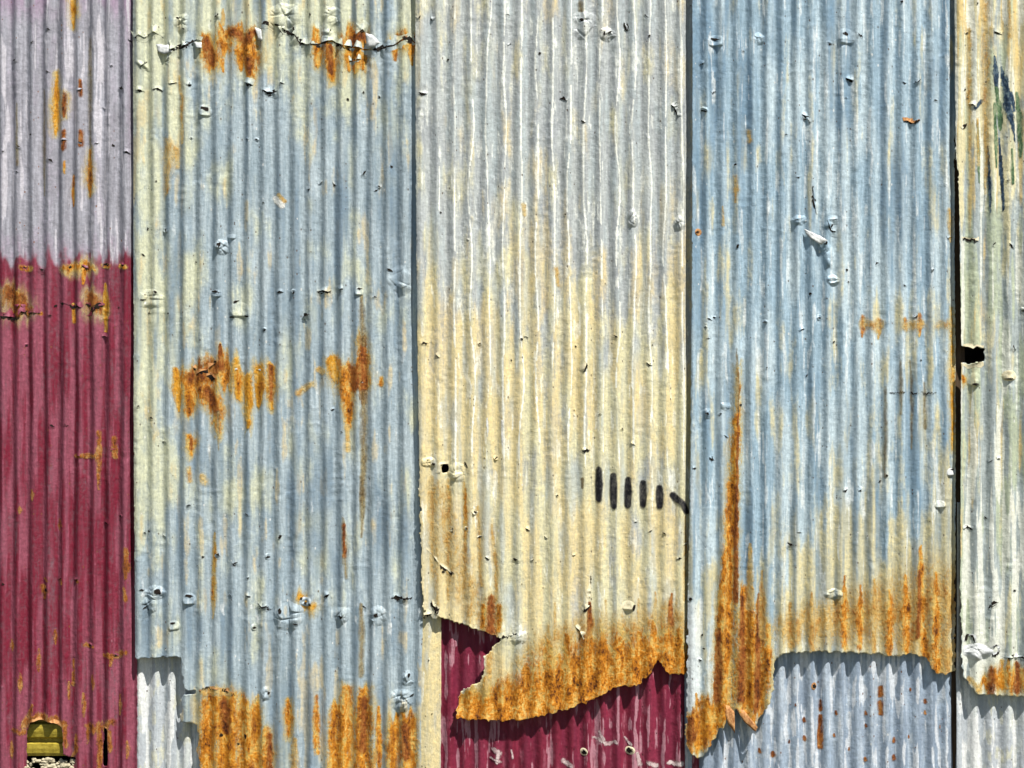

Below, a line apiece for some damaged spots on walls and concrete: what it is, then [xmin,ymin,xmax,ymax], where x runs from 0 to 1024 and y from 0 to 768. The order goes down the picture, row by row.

rust [199,8,261,80]
crack [261,15,415,69]
rust [311,23,367,88]
rust [61,259,127,333]
rust [171,342,278,450]
rust [296,295,384,538]
rust [686,348,956,758]
rust [456,516,688,722]
rust [312,603,419,768]
rust [967,659,1024,696]
rust [197,686,298,768]
peeling [592,730,684,768]